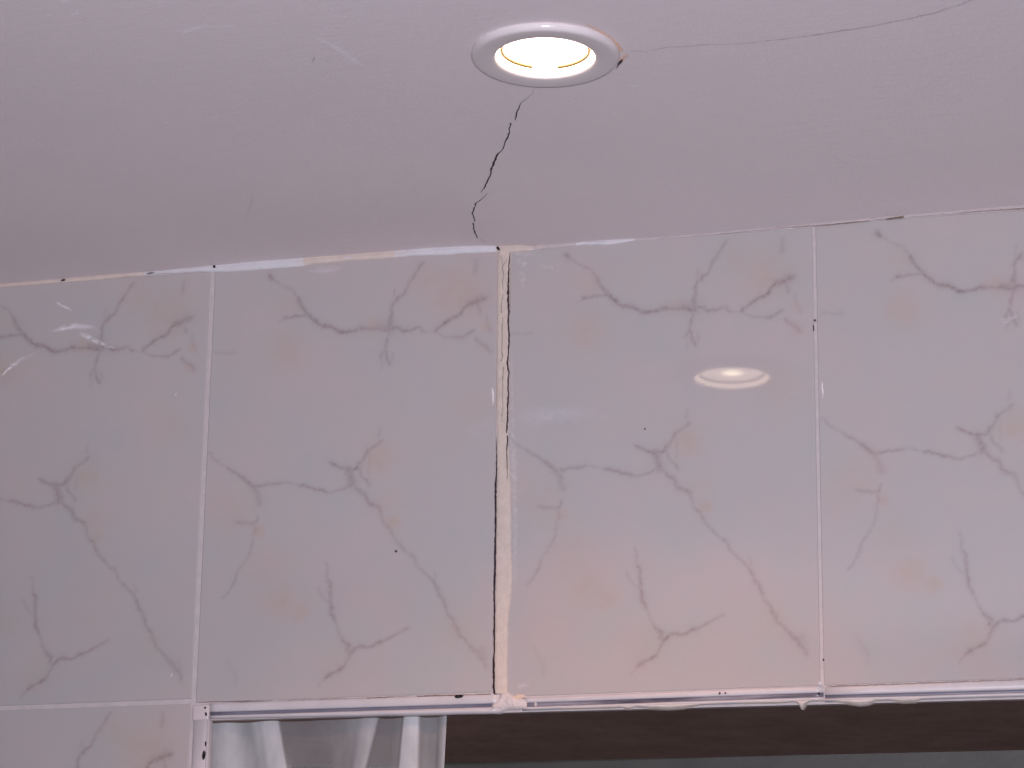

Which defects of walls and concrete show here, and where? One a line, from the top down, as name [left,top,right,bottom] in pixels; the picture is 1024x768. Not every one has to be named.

crack [472,92,533,240]